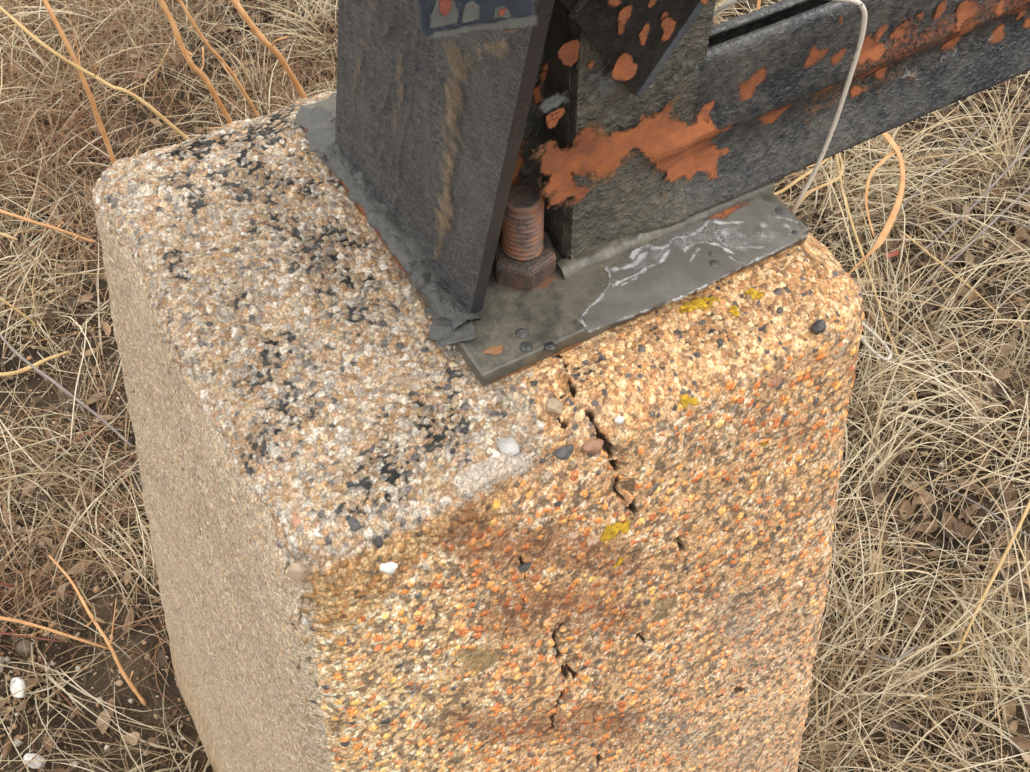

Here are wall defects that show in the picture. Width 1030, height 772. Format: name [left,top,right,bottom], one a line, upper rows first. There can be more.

rust [533,39,594,104]
rust [511,97,731,209]
rust [739,69,767,102]
rust [757,104,791,125]
rust [805,48,846,67]
rust [851,0,1030,97]
crack [554,355,636,513]
crack [549,623,577,730]